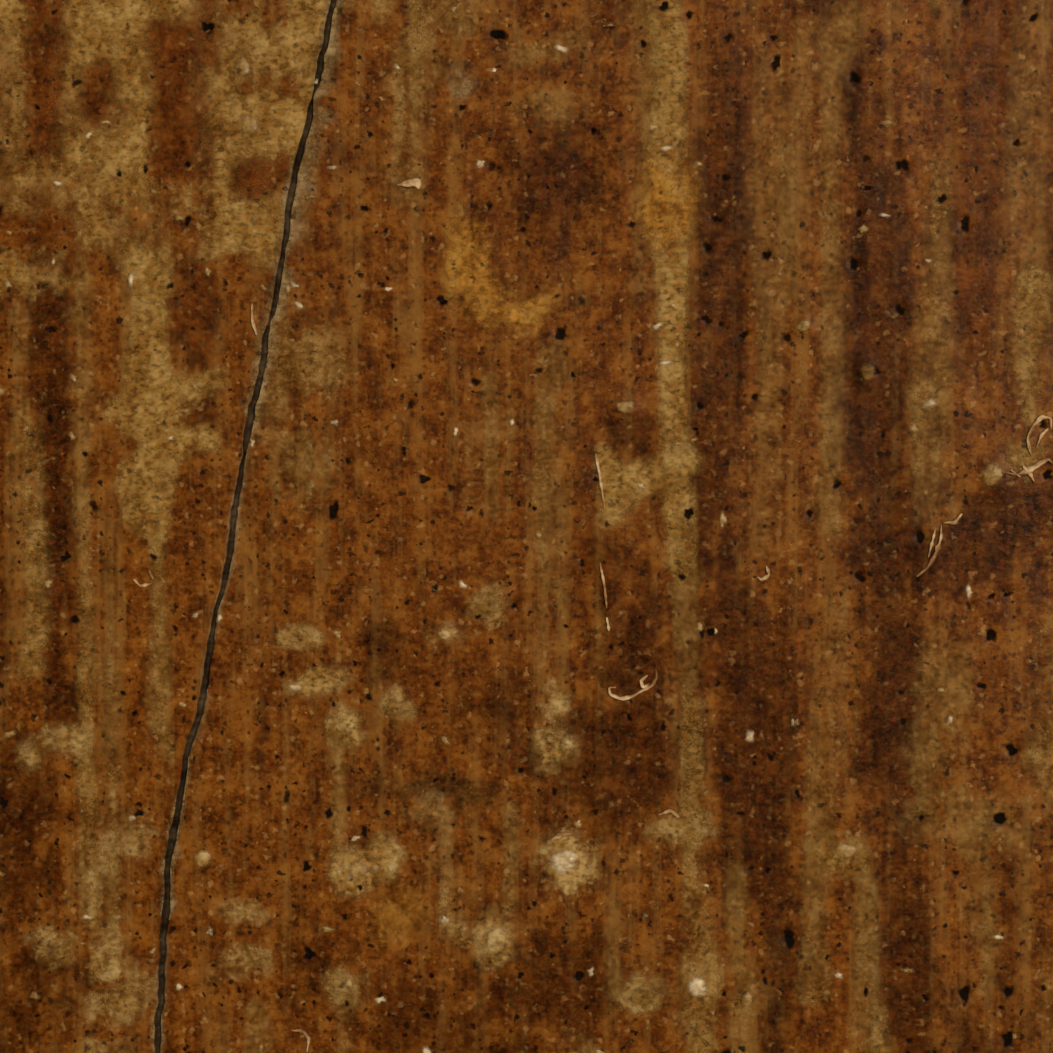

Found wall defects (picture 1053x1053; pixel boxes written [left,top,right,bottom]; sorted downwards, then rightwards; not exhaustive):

leakage [16,405,47,676]
corrosion [32,280,82,730]
crack [152,0,343,1053]
peeling [917,513,963,577]
corrosion [917,478,1053,601]
peeling [608,669,657,701]
corrosion [705,551,798,903]
leakage [681,836,722,1053]